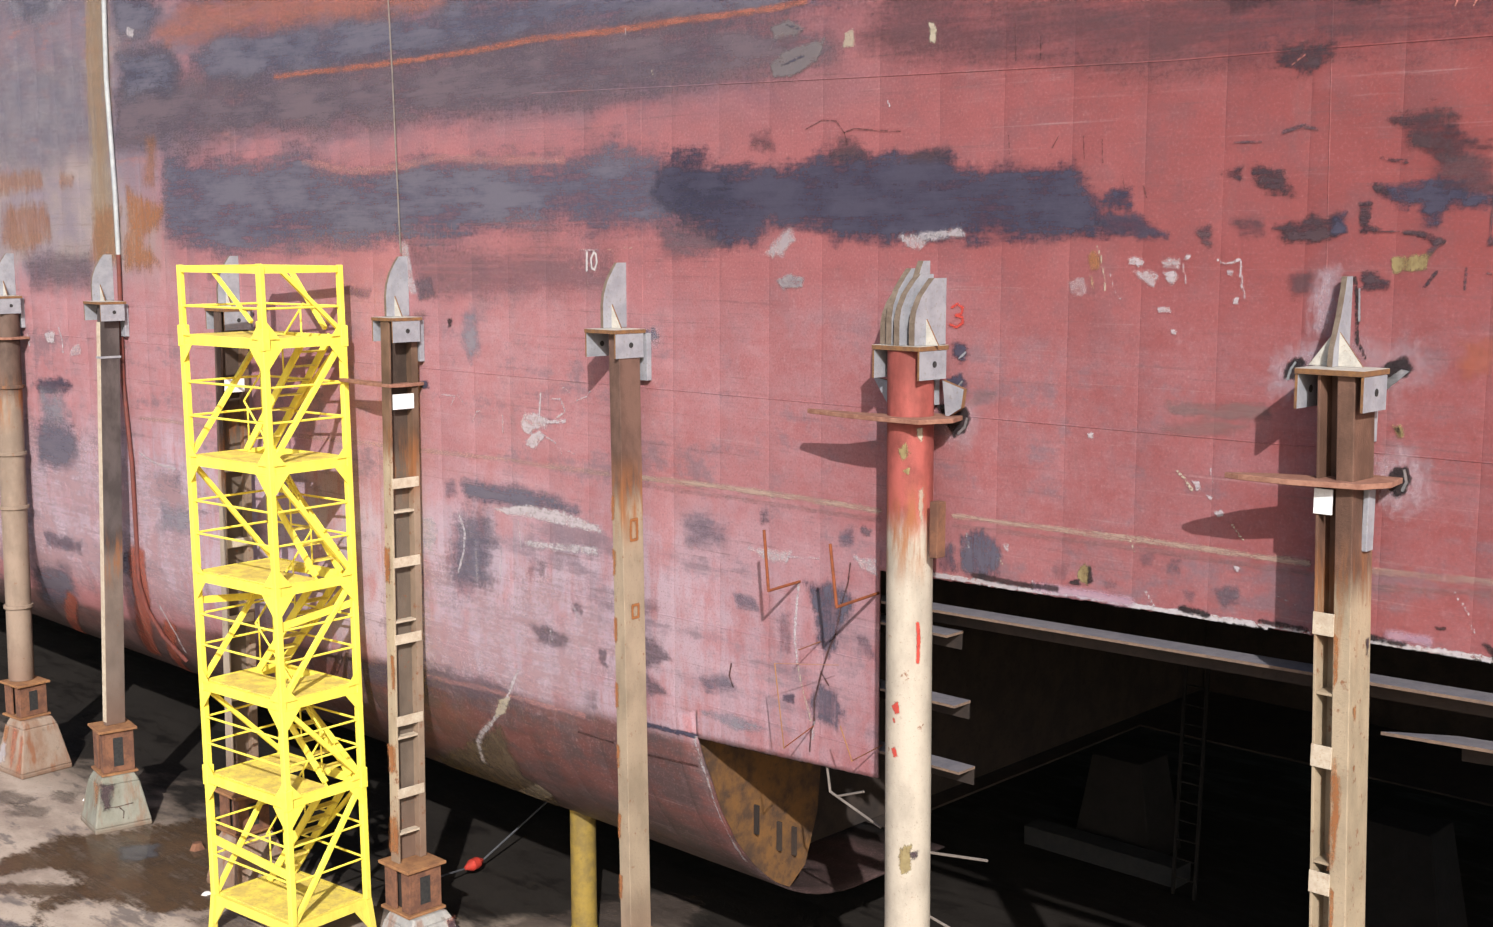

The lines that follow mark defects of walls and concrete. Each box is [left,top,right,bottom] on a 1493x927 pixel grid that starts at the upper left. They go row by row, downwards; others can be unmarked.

peeling [112,0,825,101]
peeling [1277,42,1336,73]
peeling [162,138,1169,256]
peeling [1230,109,1493,292]